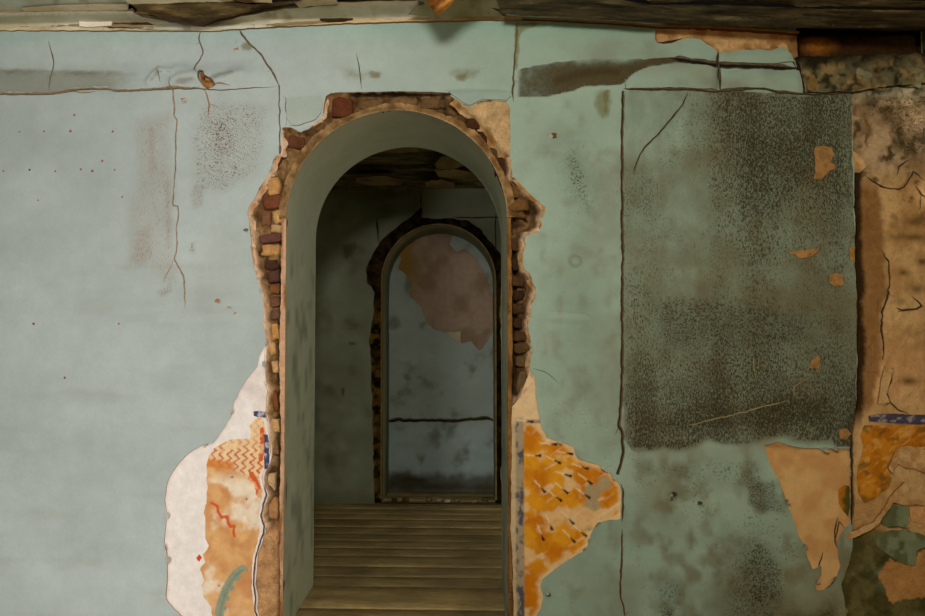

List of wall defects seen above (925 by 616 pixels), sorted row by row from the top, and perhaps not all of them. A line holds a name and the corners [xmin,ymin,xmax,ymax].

crack [0,32,228,303]
crack [239,30,287,154]
water stain [520,57,677,97]
spalling [655,28,925,94]
crack [865,159,925,208]
flaking render [163,92,621,616]
crack [615,38,851,616]
water stain [622,91,857,450]
crack [880,251,922,414]
peeling [764,428,851,590]